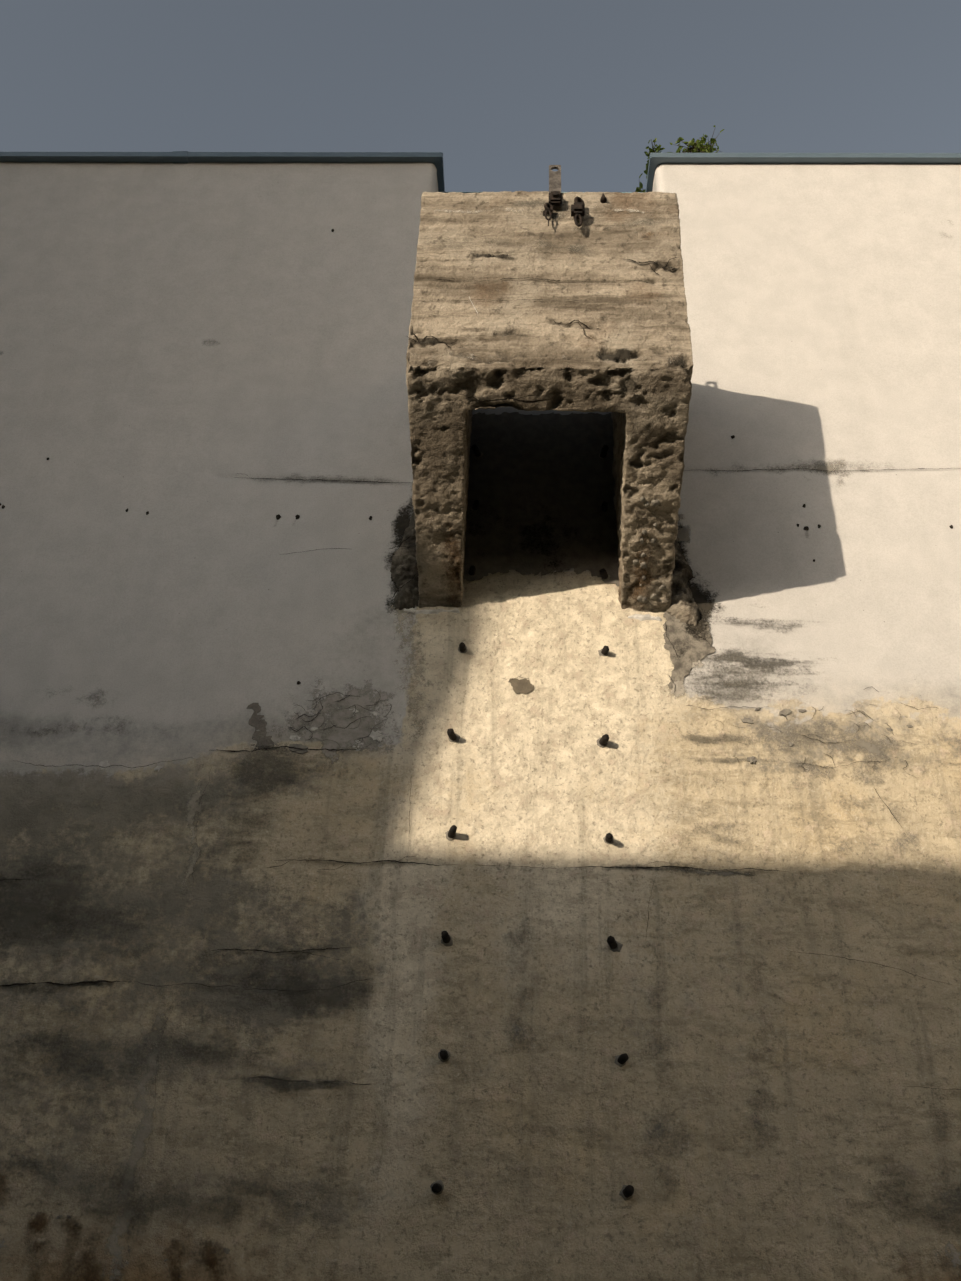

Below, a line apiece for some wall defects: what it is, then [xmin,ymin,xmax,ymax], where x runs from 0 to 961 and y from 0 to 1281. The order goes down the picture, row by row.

crack [237,473,408,483]
spalling [385,498,419,610]
leakage [703,650,797,698]
spalling [663,514,937,778]
peeling [212,680,397,764]
crack [269,776,786,937]
crack [0,947,368,992]
crack [249,1076,370,1089]